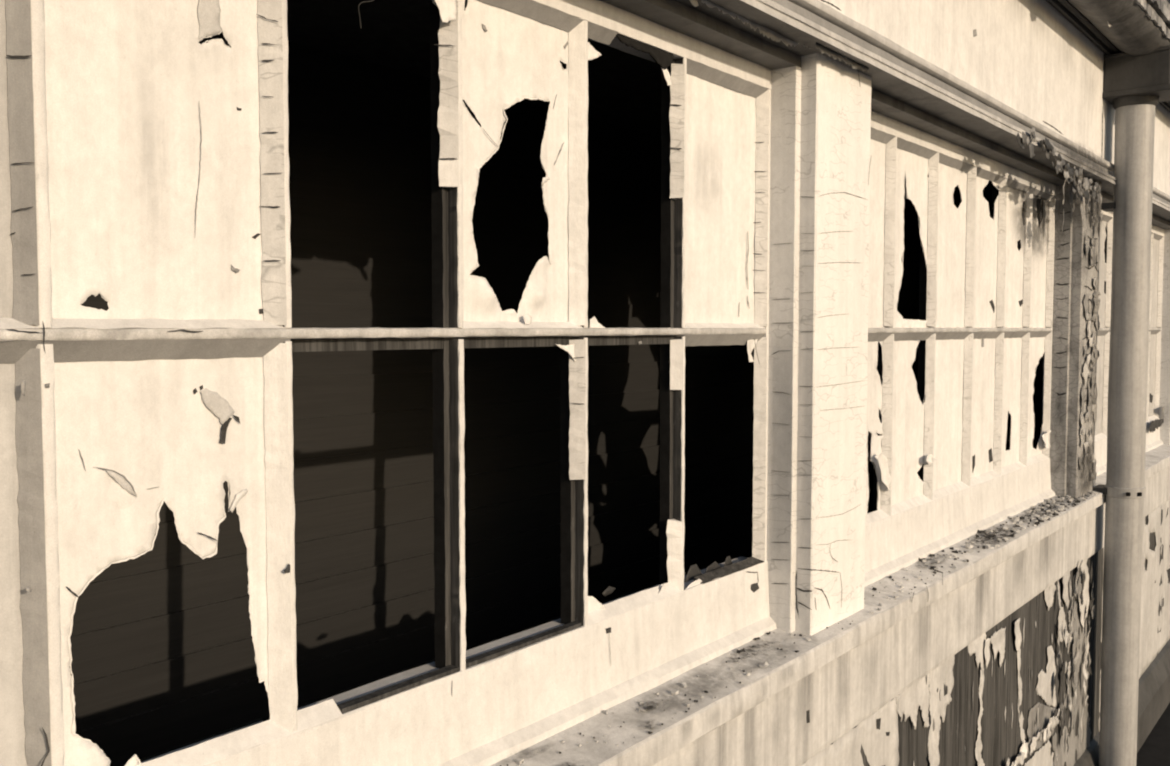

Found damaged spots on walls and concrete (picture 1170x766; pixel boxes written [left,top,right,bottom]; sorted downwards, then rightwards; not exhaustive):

crack [194,104,202,231]
crack [739,222,858,361]
peeling [1016,127,1103,484]
crack [775,381,864,496]
crack [747,504,861,617]
peeling [896,559,1096,766]